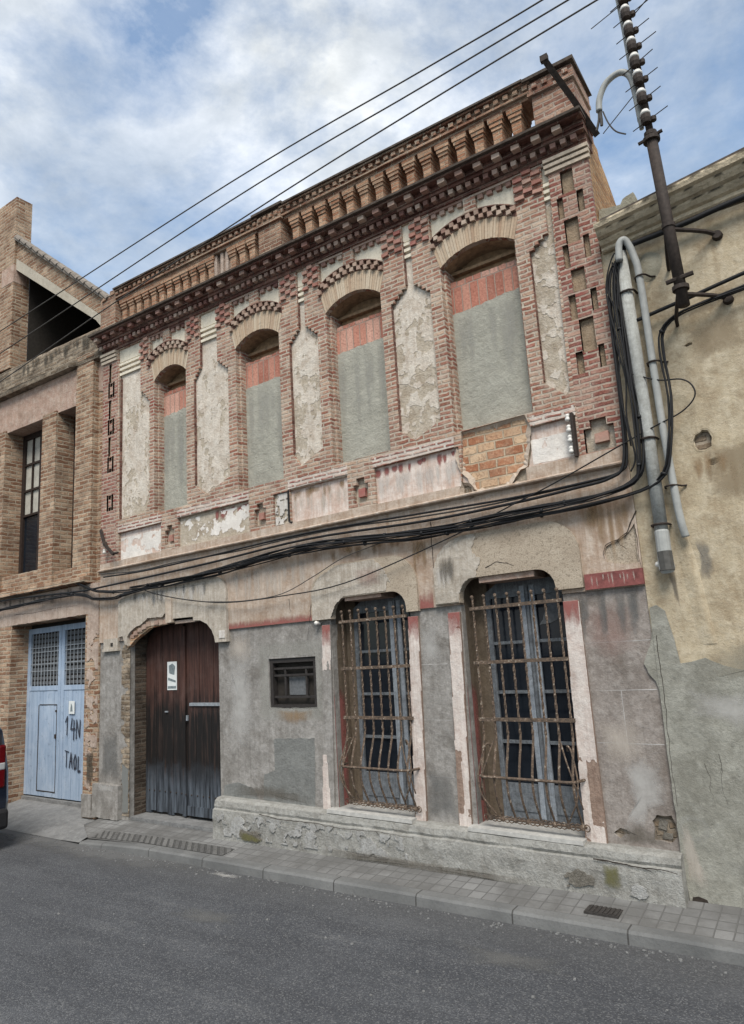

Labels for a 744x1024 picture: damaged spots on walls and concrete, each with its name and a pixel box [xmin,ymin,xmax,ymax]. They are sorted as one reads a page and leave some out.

peeling [394,246,441,440]
peeling [292,291,323,465]
peeling [196,328,230,493]
peeling [121,360,149,518]
flaking render [455,415,574,499]
flaking render [691,428,719,467]
peeling [121,529,161,560]
peeling [181,504,249,541]
crack [603,511,642,567]
flaking render [654,815,678,842]
spalling [564,868,594,887]